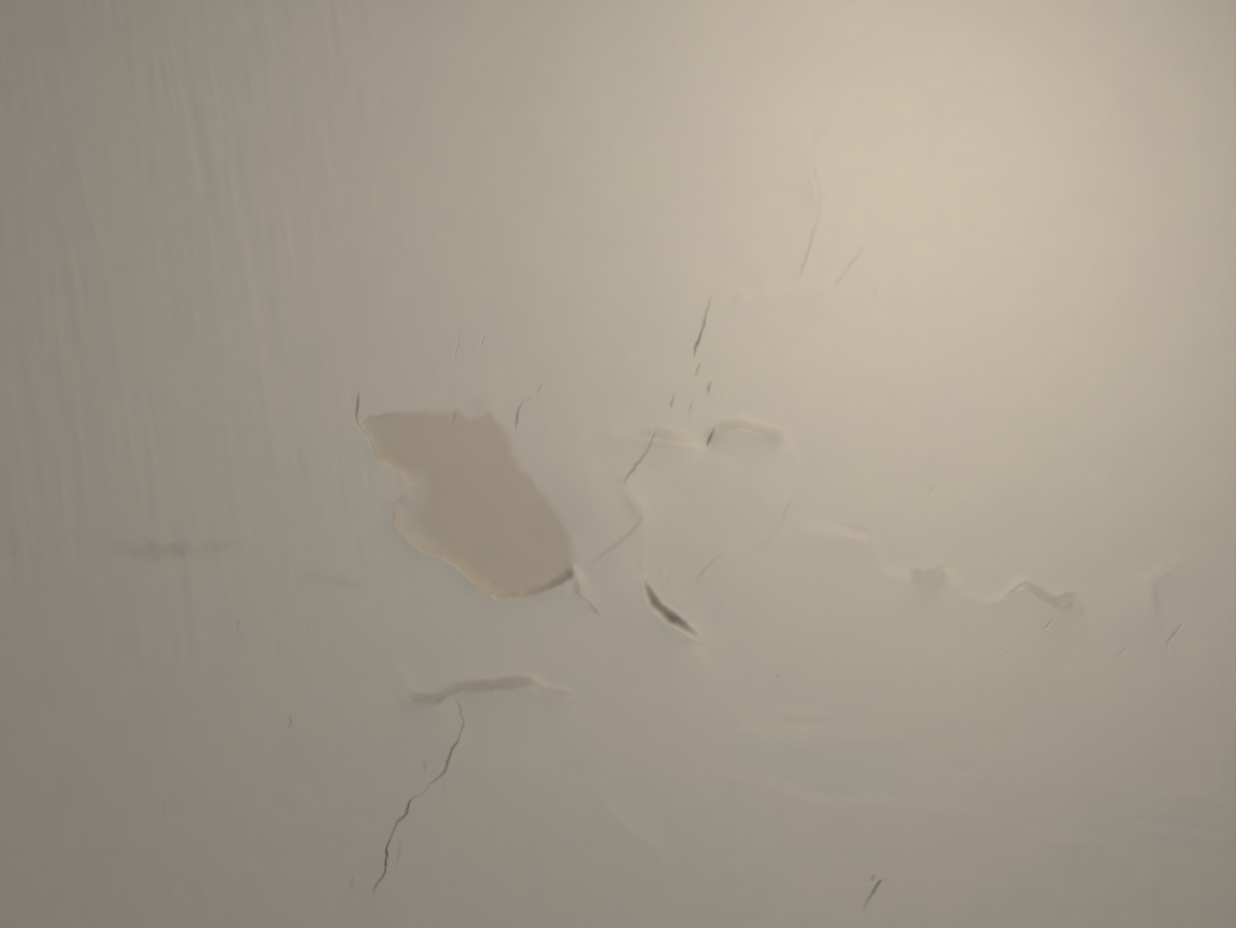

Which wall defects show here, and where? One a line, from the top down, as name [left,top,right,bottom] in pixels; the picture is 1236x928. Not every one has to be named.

peeling [351,382,585,610]
crack [367,691,468,902]